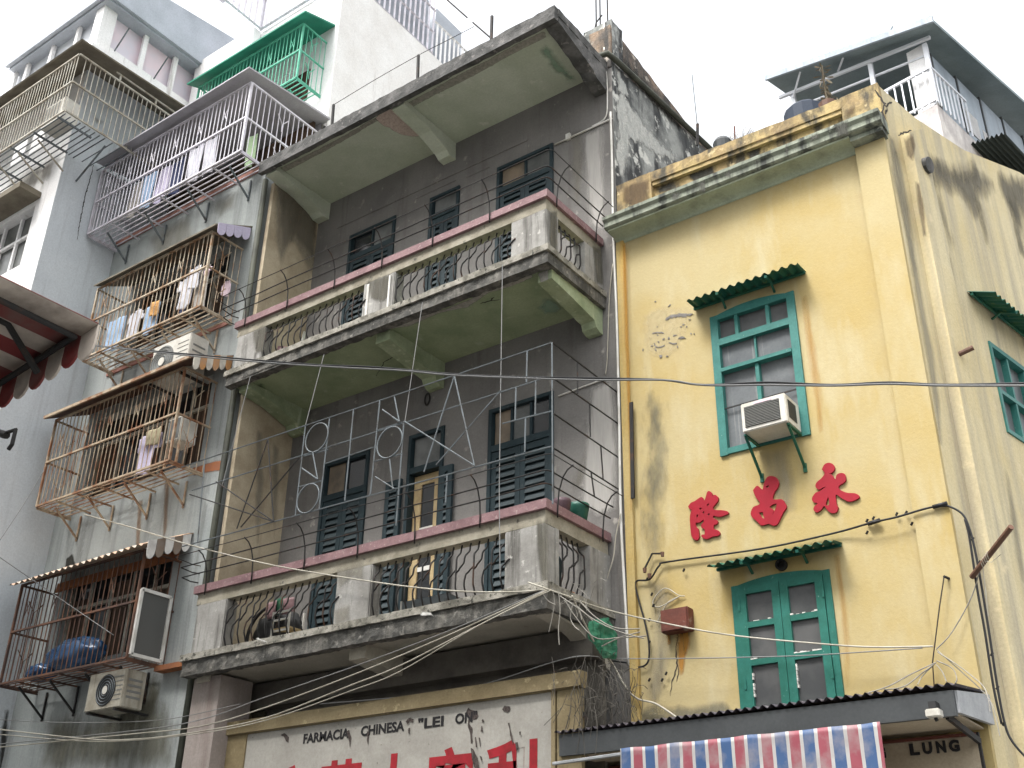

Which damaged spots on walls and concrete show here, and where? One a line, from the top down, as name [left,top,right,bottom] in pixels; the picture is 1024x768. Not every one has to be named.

damp [624,60,681,129]
damp [932,161,1024,254]
peeling [642,304,695,358]
rust [668,632,689,672]